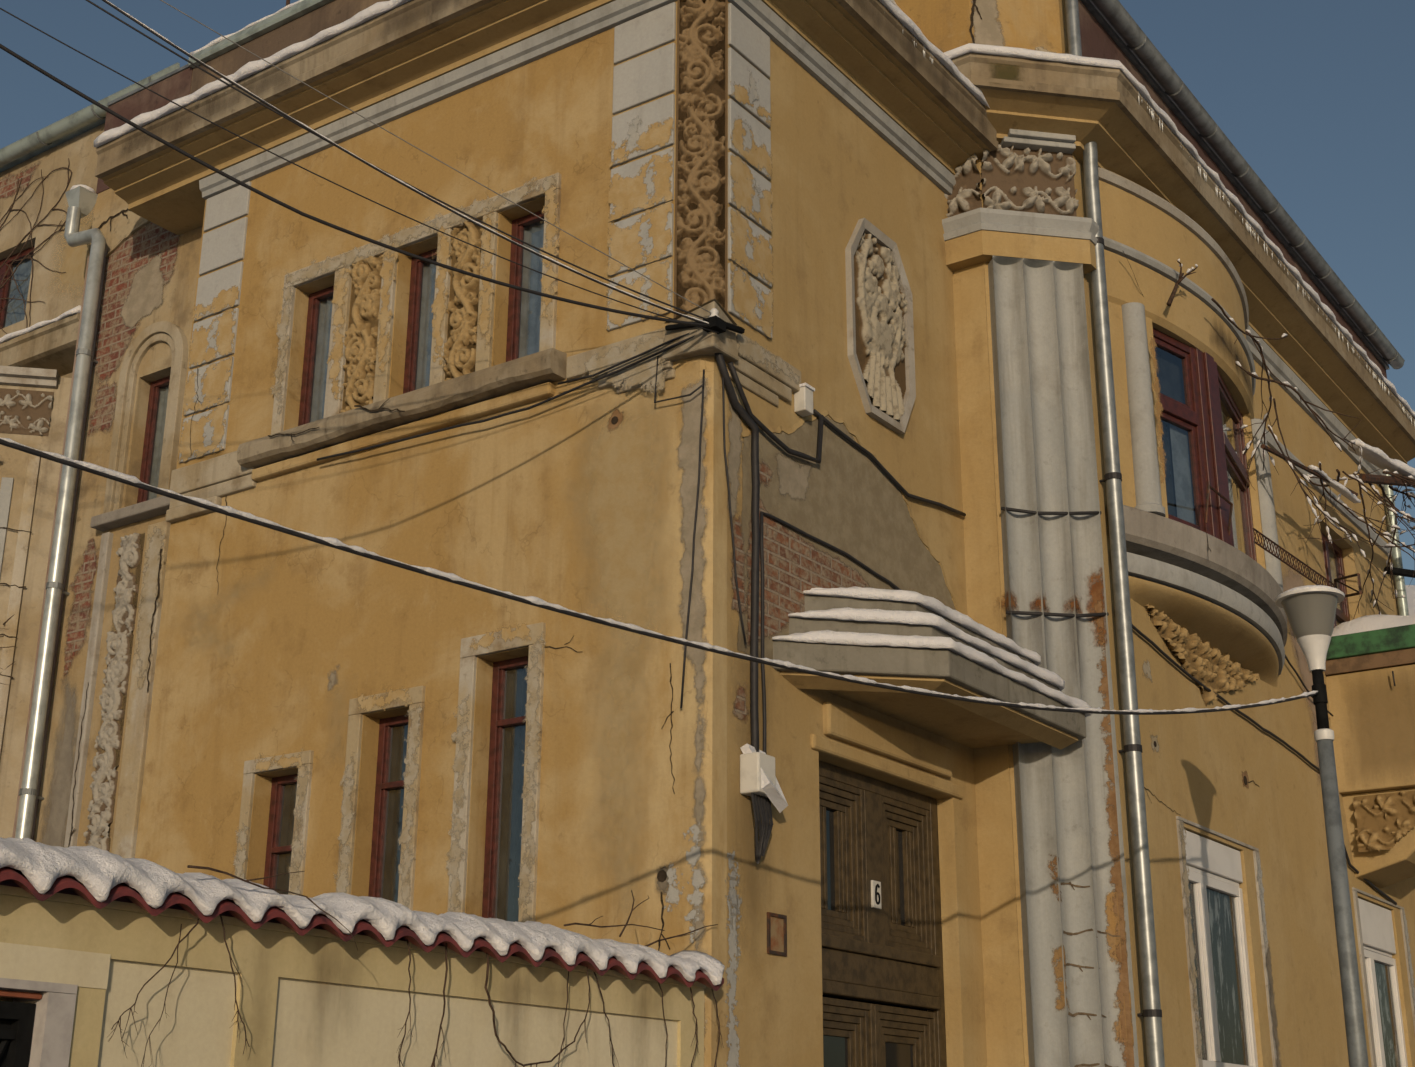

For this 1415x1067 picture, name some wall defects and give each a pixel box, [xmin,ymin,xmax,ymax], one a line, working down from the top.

crack [969,0,982,44]
flaking render [59,220,180,435]
peeling [178,285,239,462]
peeling [582,336,668,393]
peeling [606,116,673,329]
peeling [730,71,800,383]
peeling [727,387,958,671]
peeling [471,623,545,922]
peeling [657,378,710,951]
peeling [1087,568,1135,1067]
peeling [724,851,742,1067]
peeling [1052,946,1069,1010]